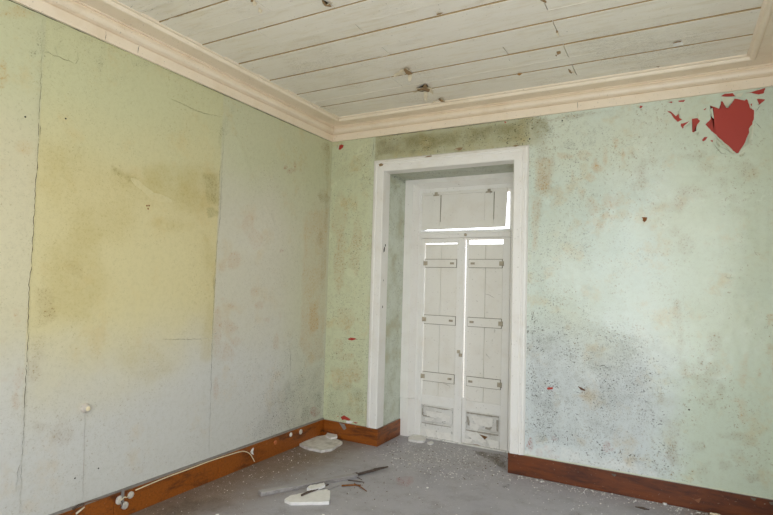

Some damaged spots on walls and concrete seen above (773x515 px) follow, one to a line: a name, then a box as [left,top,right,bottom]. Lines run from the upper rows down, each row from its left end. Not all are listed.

water stain [0,123,244,412]
crack [6,0,328,515]
water stain [247,107,761,443]
water stain [525,296,773,485]
peeling [667,88,765,156]